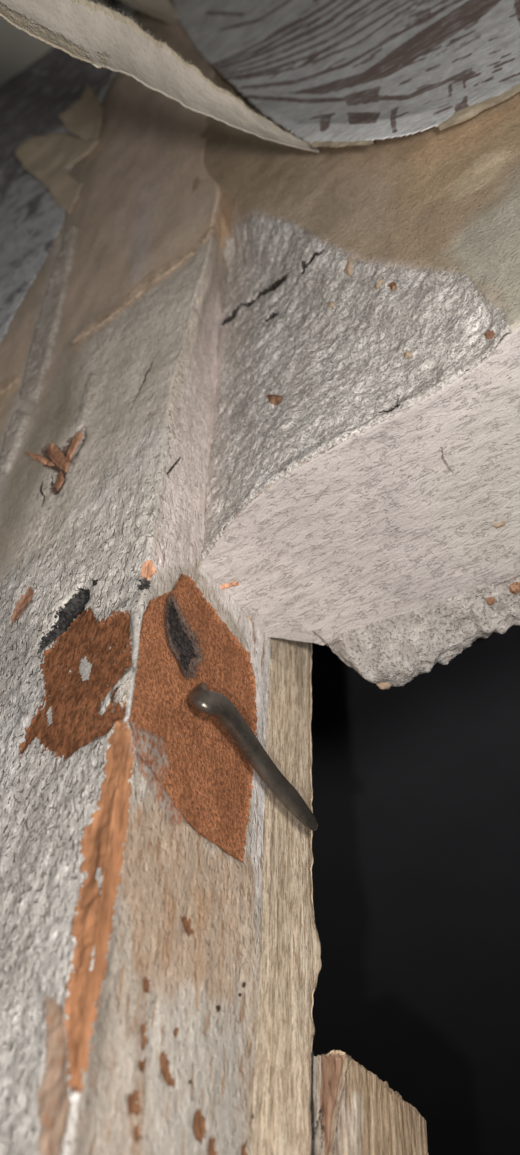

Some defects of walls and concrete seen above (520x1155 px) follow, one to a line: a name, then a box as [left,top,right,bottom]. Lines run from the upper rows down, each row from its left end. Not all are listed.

crack [222,248,326,326]
spalling [10,587,34,623]
rust [182,915,194,936]
rust [138,1021,147,1074]
rust [160,1051,175,1089]
rust [127,1089,143,1142]
rust [193,1107,217,1155]